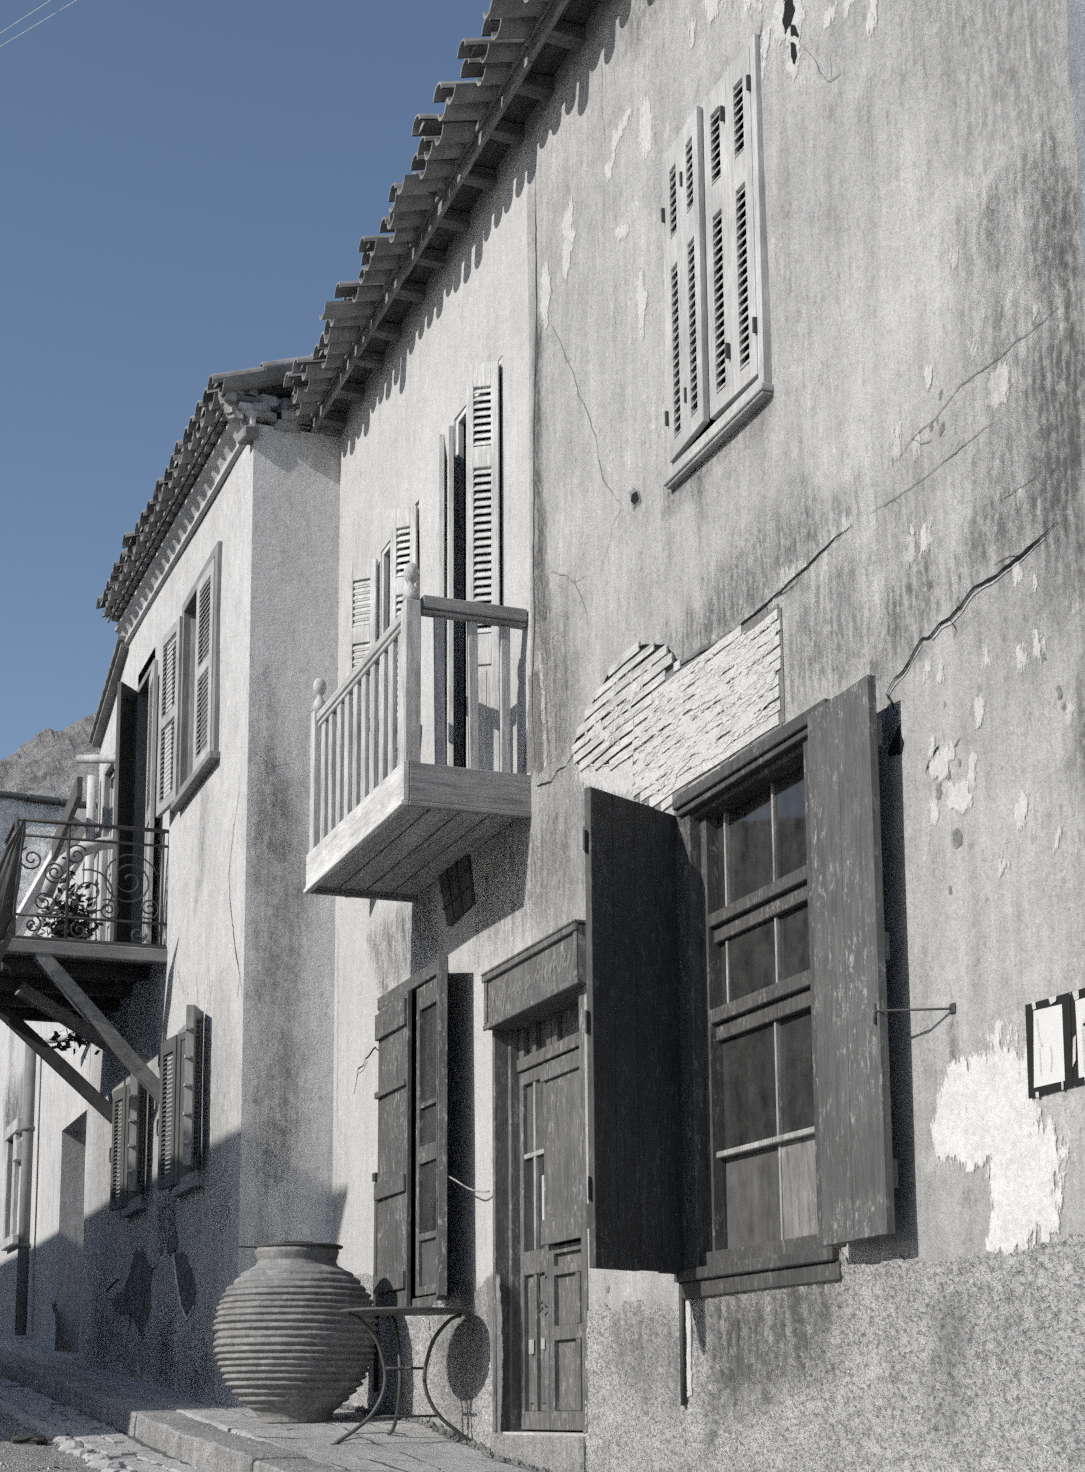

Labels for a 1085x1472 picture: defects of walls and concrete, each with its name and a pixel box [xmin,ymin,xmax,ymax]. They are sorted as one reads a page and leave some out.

flaking render [688,0,726,48]
flaking render [745,0,878,81]
crack [681,305,1059,666]
flaking render [572,557,807,811]
flaking render [905,522,933,566]
crack [885,522,1057,713]
flaking render [975,695,985,729]
flaking render [1012,561,1037,594]
flaking render [1016,630,1046,673]
flaking render [927,735,977,848]
flaking render [930,1019,1069,1256]
flaking render [112,1231,196,1344]